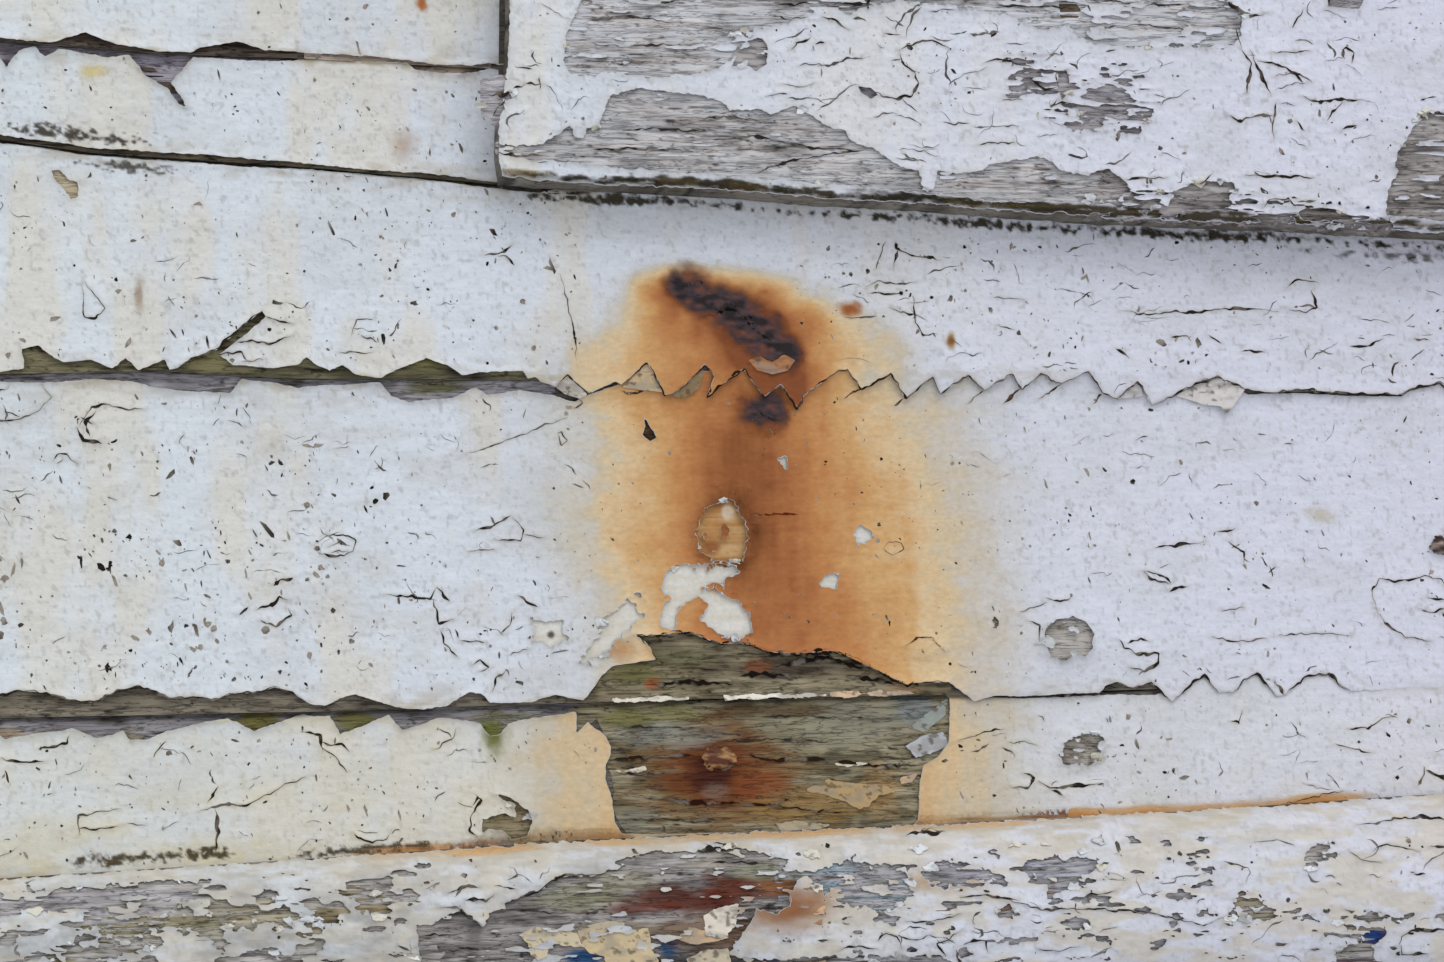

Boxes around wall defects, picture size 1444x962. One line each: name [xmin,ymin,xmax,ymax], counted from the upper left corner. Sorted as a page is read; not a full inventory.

crack [487,0,696,163]
peeling [0,0,1444,238]
crack [594,0,1210,185]
crack [1228,0,1378,207]
peeling [0,312,570,402]
rust [566,264,1364,829]
rust [357,712,651,855]
peeling [0,497,1414,962]
rust [674,828,867,839]